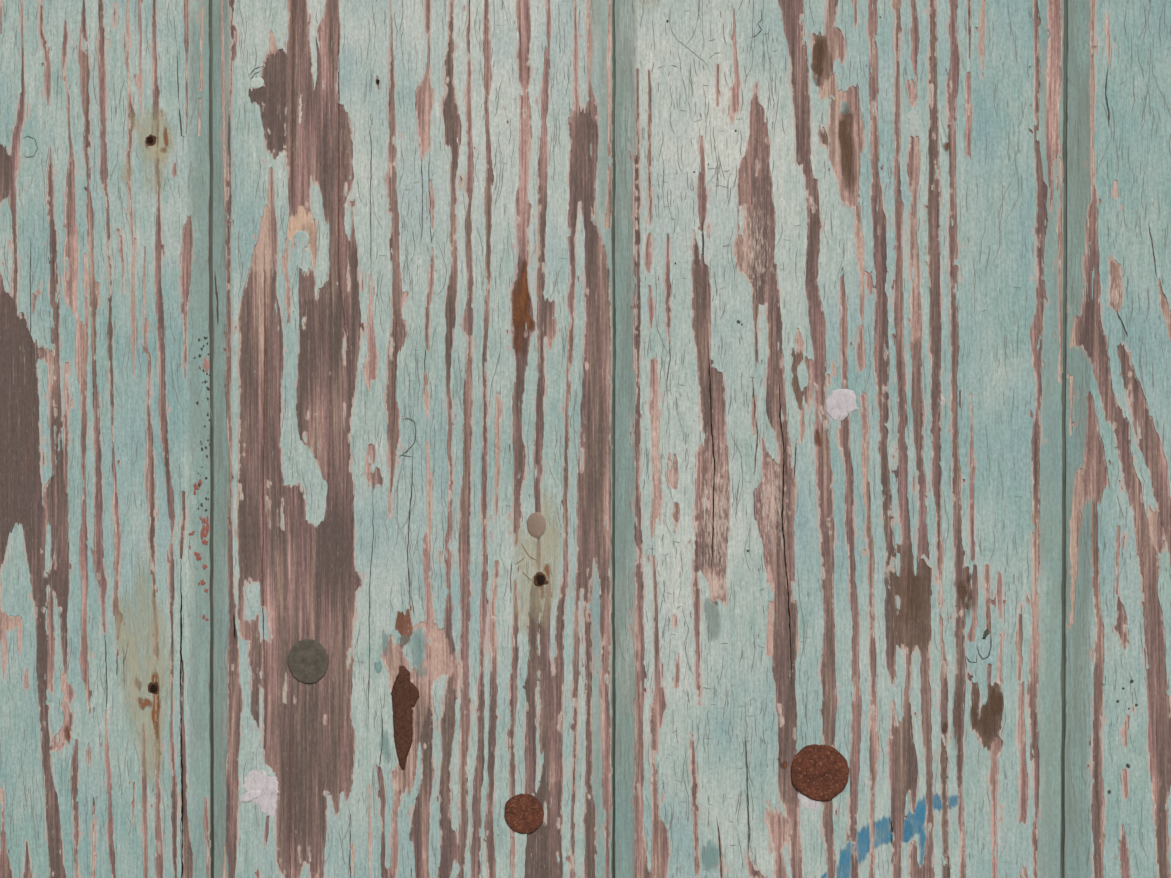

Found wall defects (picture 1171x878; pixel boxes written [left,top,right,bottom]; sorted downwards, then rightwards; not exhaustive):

peeling [0,0,210,878]
rust [118,621,161,771]
rust [143,114,169,162]
peeling [221,0,409,878]
peeling [368,0,613,878]
peeling [714,0,1171,878]